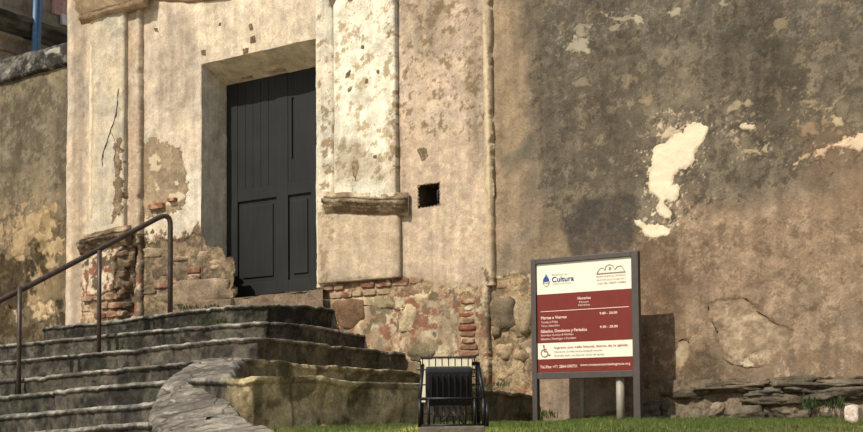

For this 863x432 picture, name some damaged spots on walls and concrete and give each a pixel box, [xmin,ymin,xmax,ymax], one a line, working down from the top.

crack [102,89,127,224]
peeling [143,137,190,220]
peeling [634,122,708,239]
peeling [793,114,863,166]
damp [567,197,634,255]
flaking render [80,233,238,323]
flaking render [323,277,434,332]
flaking render [407,343,435,362]
flaking render [457,291,485,363]